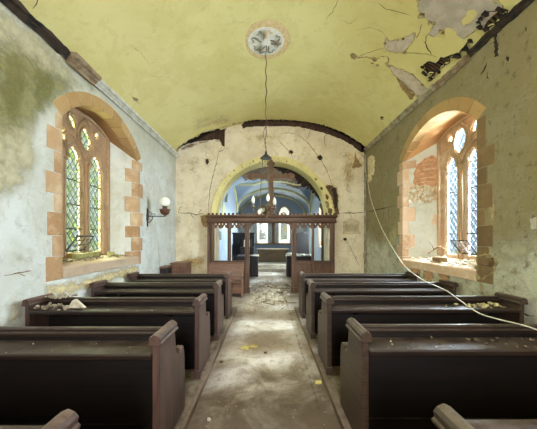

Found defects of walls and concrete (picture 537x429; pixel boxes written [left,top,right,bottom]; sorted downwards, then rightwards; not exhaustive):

peeling [356,0,504,100]
damp [0,11,71,191]
crack [178,147,224,218]
spalling [232,119,376,183]
crack [280,130,332,184]
spalling [320,183,340,215]
flaking render [408,155,438,207]
damp [47,266,138,294]
flaking render [474,253,499,280]